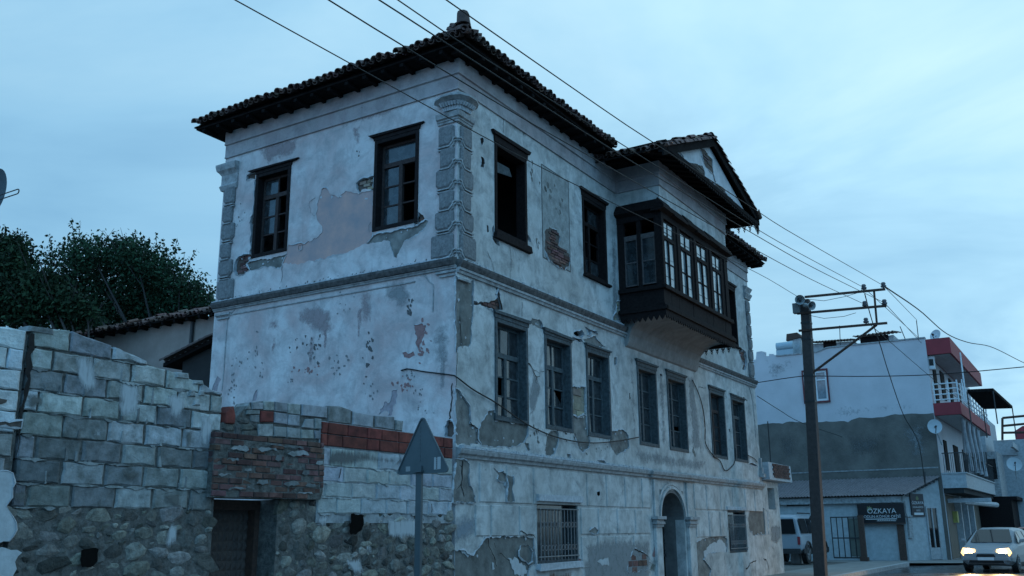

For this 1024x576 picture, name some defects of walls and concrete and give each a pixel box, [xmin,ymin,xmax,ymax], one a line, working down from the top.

flaking render [233,172,428,276]
flaking render [536,227,571,271]
flaking render [453,276,502,352]
peeling [362,299,434,416]
flaking render [444,385,629,464]
flaking render [452,458,476,505]
flaking render [497,469,515,503]
flaking render [452,535,537,576]
flaking render [697,536,728,576]